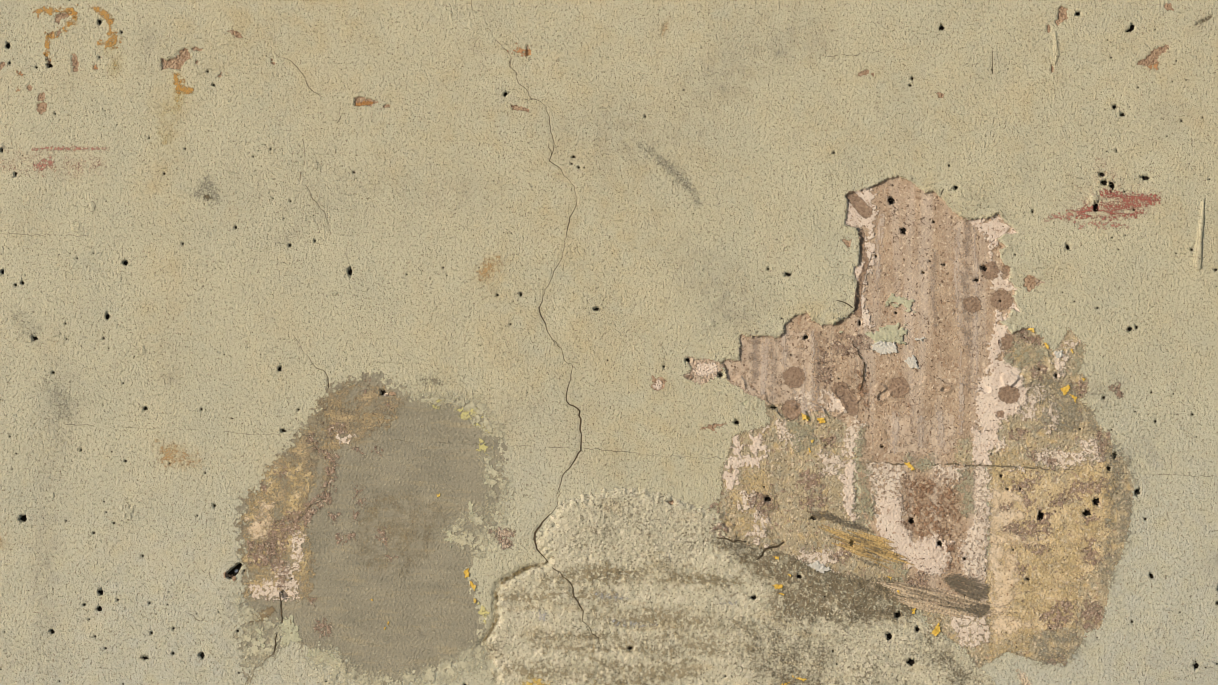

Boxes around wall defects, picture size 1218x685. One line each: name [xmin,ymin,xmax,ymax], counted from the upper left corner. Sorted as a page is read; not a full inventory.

damp [247,432,339,590]
spalling [488,527,516,550]
crack [471,1,582,561]
peeling [683,176,1140,685]